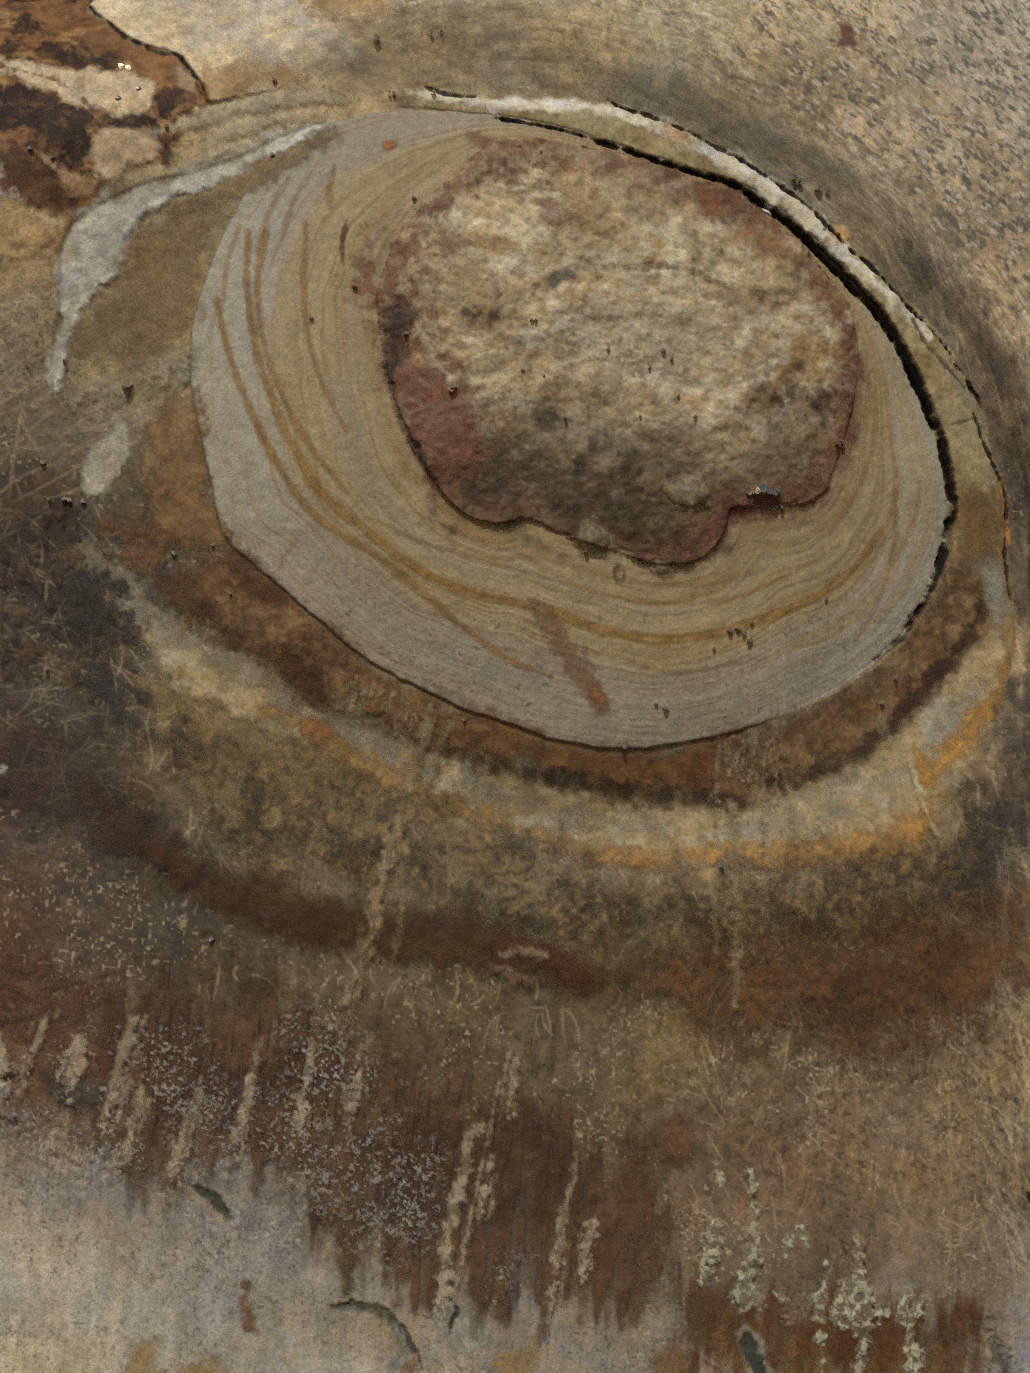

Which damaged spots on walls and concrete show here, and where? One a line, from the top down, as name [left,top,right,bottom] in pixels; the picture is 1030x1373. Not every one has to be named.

spalling [0,0,327,504]
damp [0,498,1030,1066]
rust [216,230,882,713]
rust [95,389,1008,872]
crack [426,87,1030,661]
damp [0,951,983,1373]